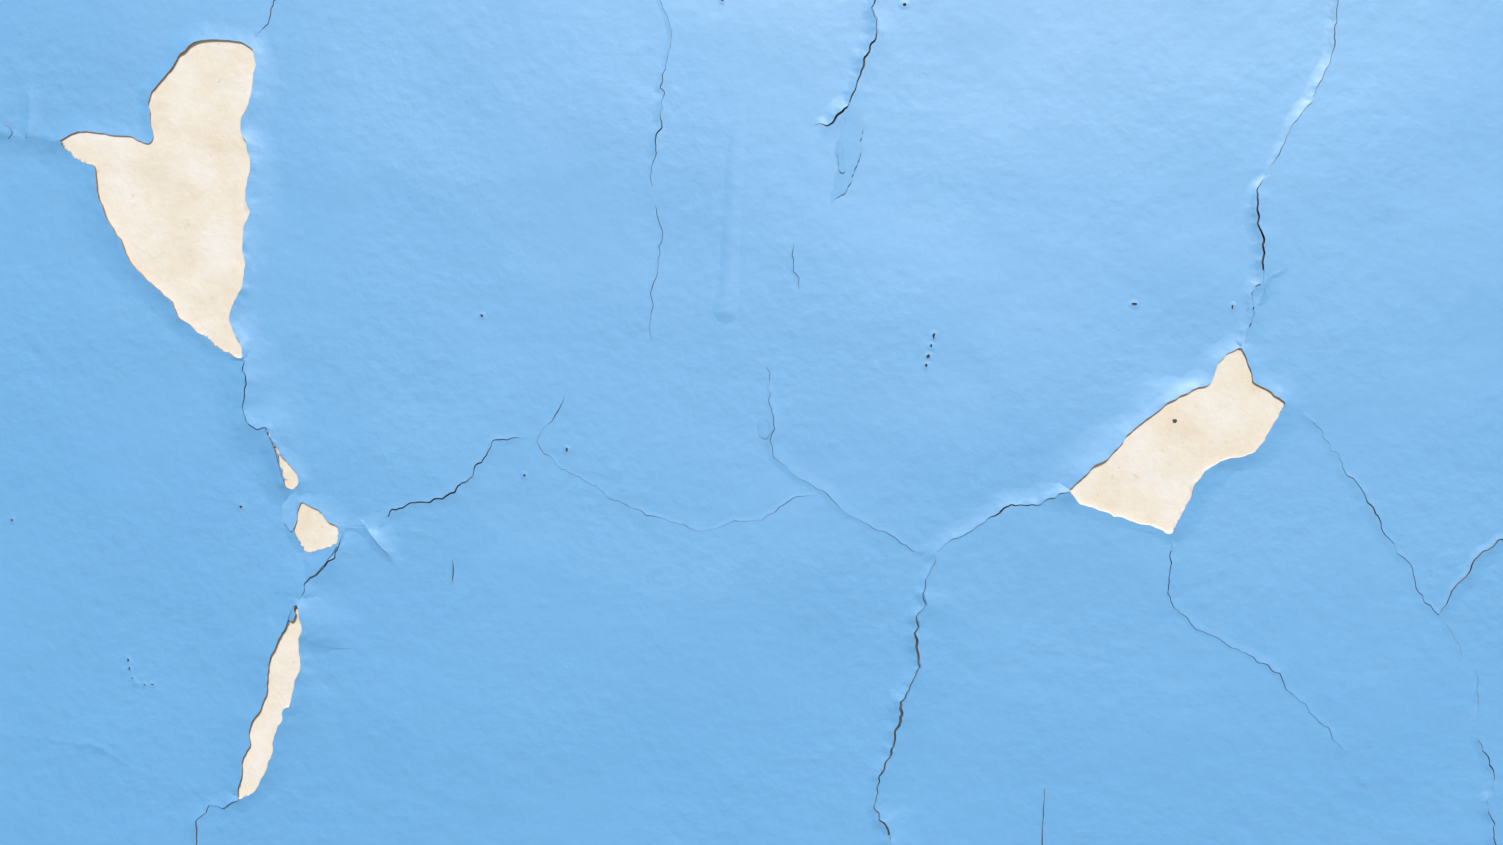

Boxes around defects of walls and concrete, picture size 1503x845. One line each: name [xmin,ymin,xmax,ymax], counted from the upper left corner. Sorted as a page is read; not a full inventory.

peeling [45,21,285,375]
crack [240,0,275,48]
crack [647,0,672,335]
crack [813,0,897,204]
crack [1234,0,1338,371]
crack [203,326,307,480]
peeling [201,423,364,814]
crack [269,367,1090,845]
peeling [1030,327,1312,551]
crack [1163,520,1350,756]
crack [1279,398,1503,845]
crack [182,778,251,845]